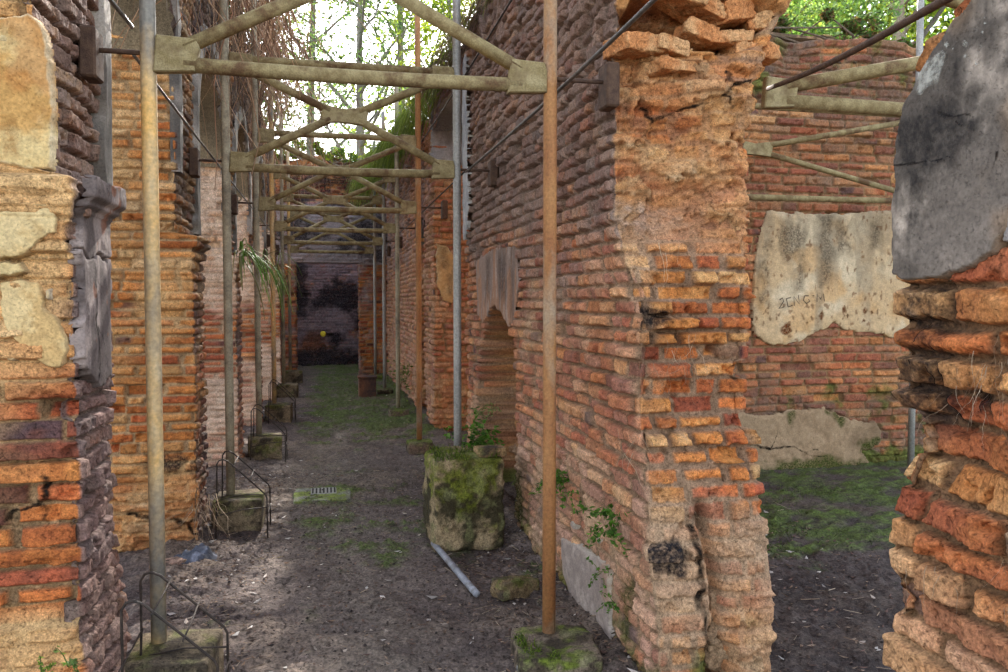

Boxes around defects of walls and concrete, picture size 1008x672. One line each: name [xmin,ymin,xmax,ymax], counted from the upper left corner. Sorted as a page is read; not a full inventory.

peeling [166,0,182,37]
spalling [603,0,781,77]
peeling [0,0,127,388]
peeling [169,73,221,174]
peeling [749,0,1008,345]
peeling [738,406,881,470]